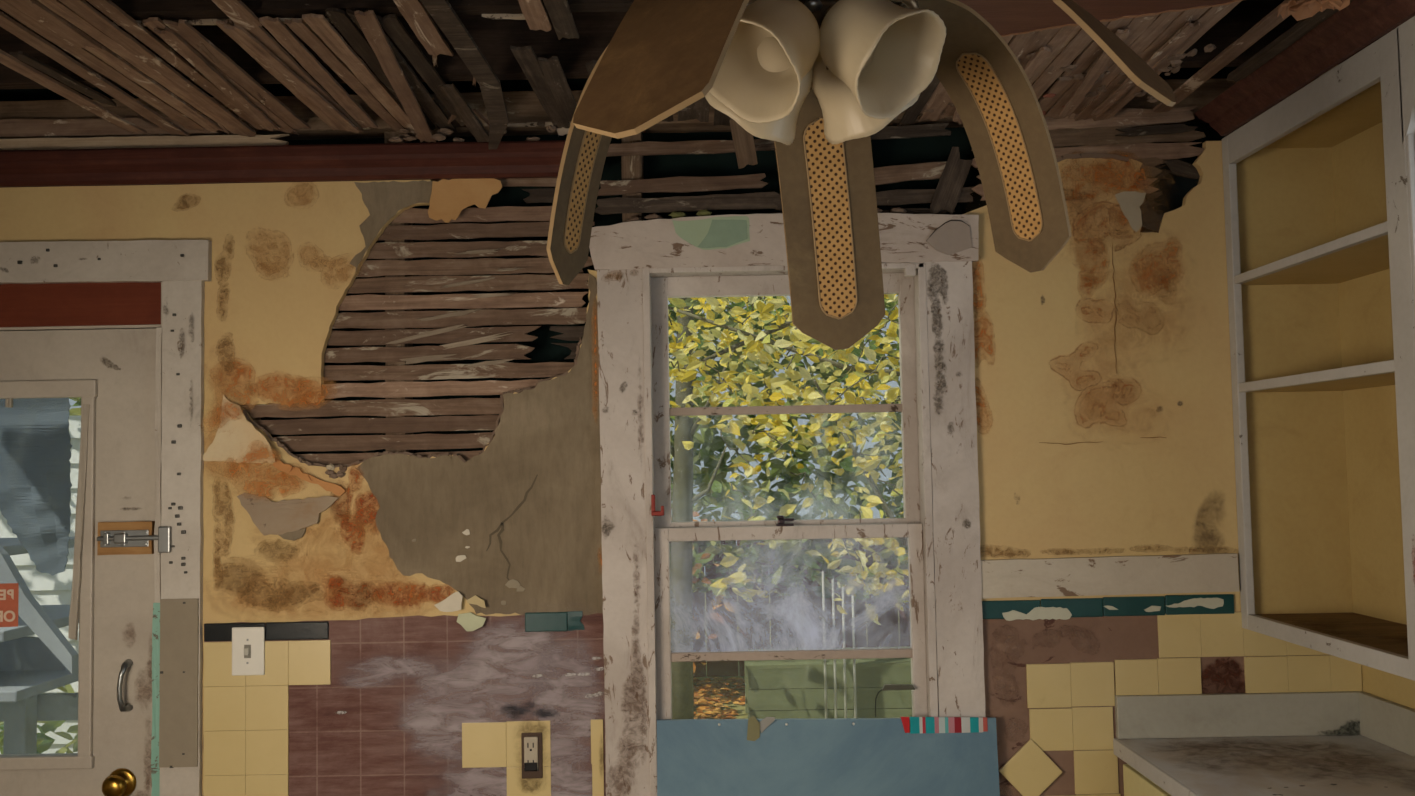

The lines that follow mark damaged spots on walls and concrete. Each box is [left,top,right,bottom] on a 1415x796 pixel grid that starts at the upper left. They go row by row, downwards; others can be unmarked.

peeling [1277,0,1350,21]
flaking render [971,150,985,201]
flaking render [1045,106,1206,233]
leakage [212,341,329,426]
leakage [214,447,319,608]
spalling [203,178,612,796]
crack [486,475,538,580]
peeling [983,598,1251,796]